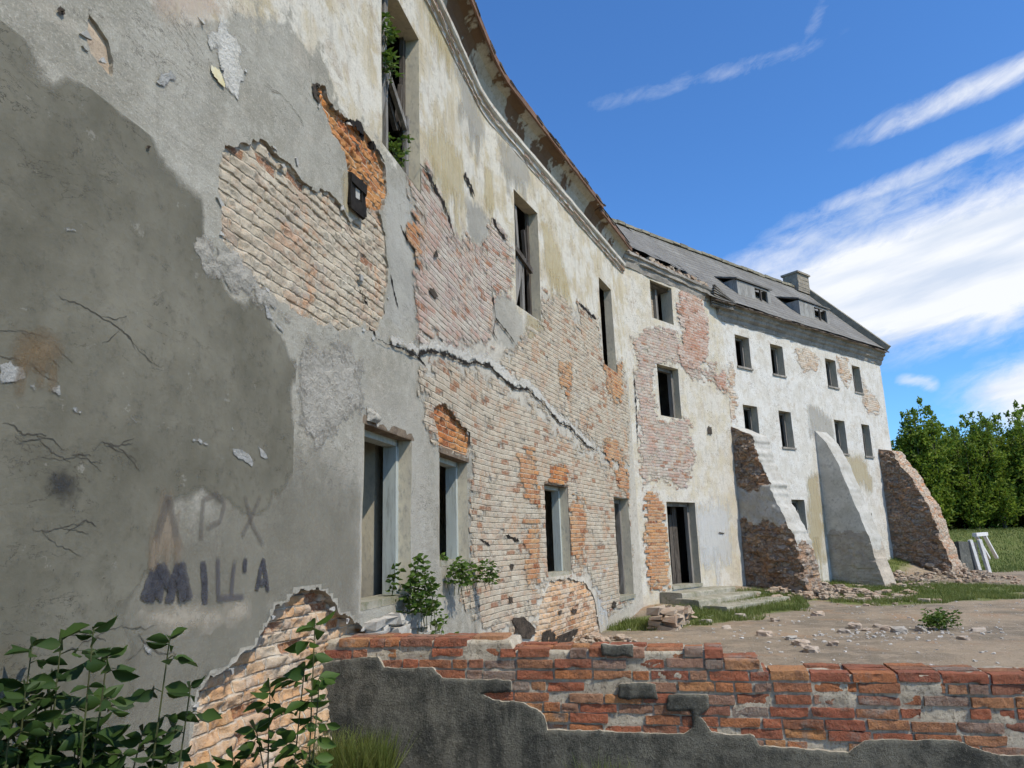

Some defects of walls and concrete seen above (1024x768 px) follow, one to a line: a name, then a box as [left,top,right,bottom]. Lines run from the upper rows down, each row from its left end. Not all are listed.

flaking render [79,18,110,74]
peeling [198,17,247,99]
flaking render [215,87,389,341]
crack [60,297,158,366]
water stain [0,20,356,756]
crack [369,324,598,452]
flaking render [406,158,739,642]
crack [3,423,140,471]
crack [33,520,95,556]